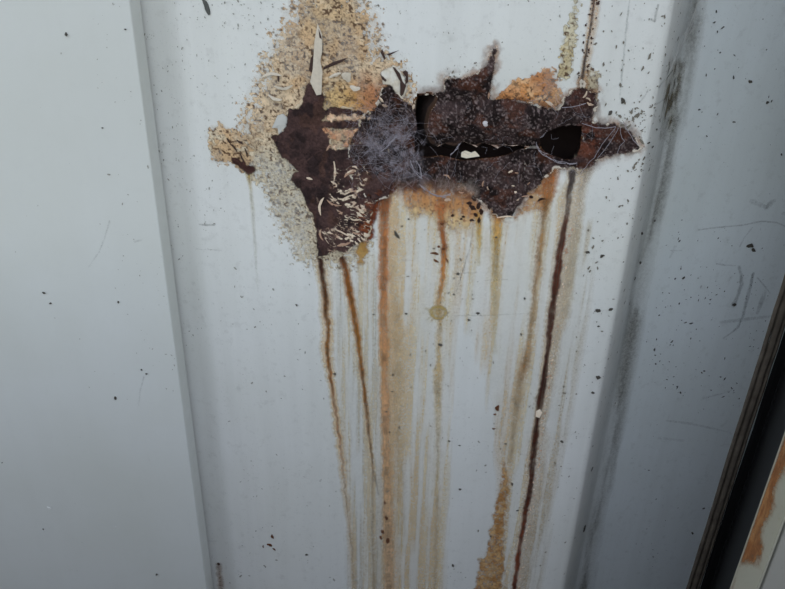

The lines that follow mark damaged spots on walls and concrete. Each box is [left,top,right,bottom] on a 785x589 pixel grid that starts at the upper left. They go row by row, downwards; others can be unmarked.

peeling [381,50,408,97]
corrosion [269,47,643,589]
corrosion [741,437,785,563]